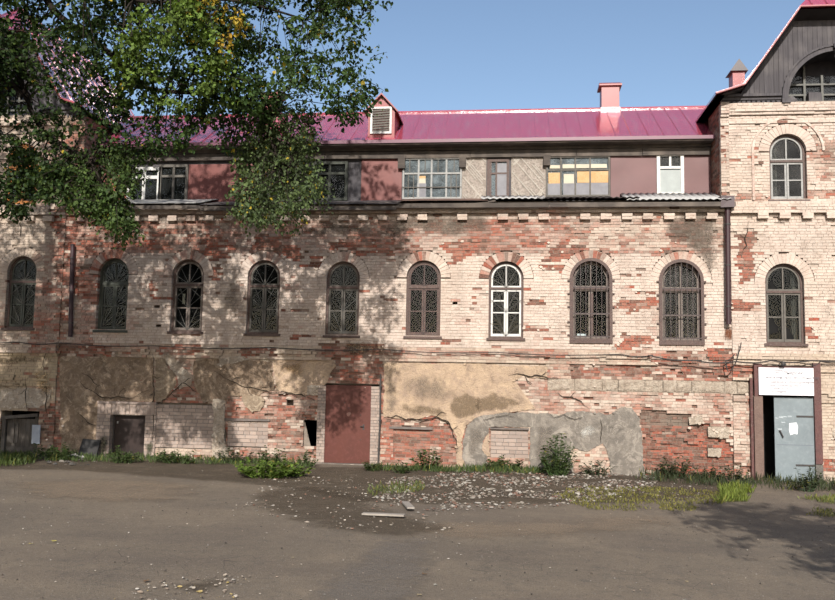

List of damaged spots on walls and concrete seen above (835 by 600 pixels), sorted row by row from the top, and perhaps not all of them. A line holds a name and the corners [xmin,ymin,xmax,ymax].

crack [80,354,196,441]
crack [215,371,312,399]
peeling [0,207,753,479]
water stain [451,394,518,417]